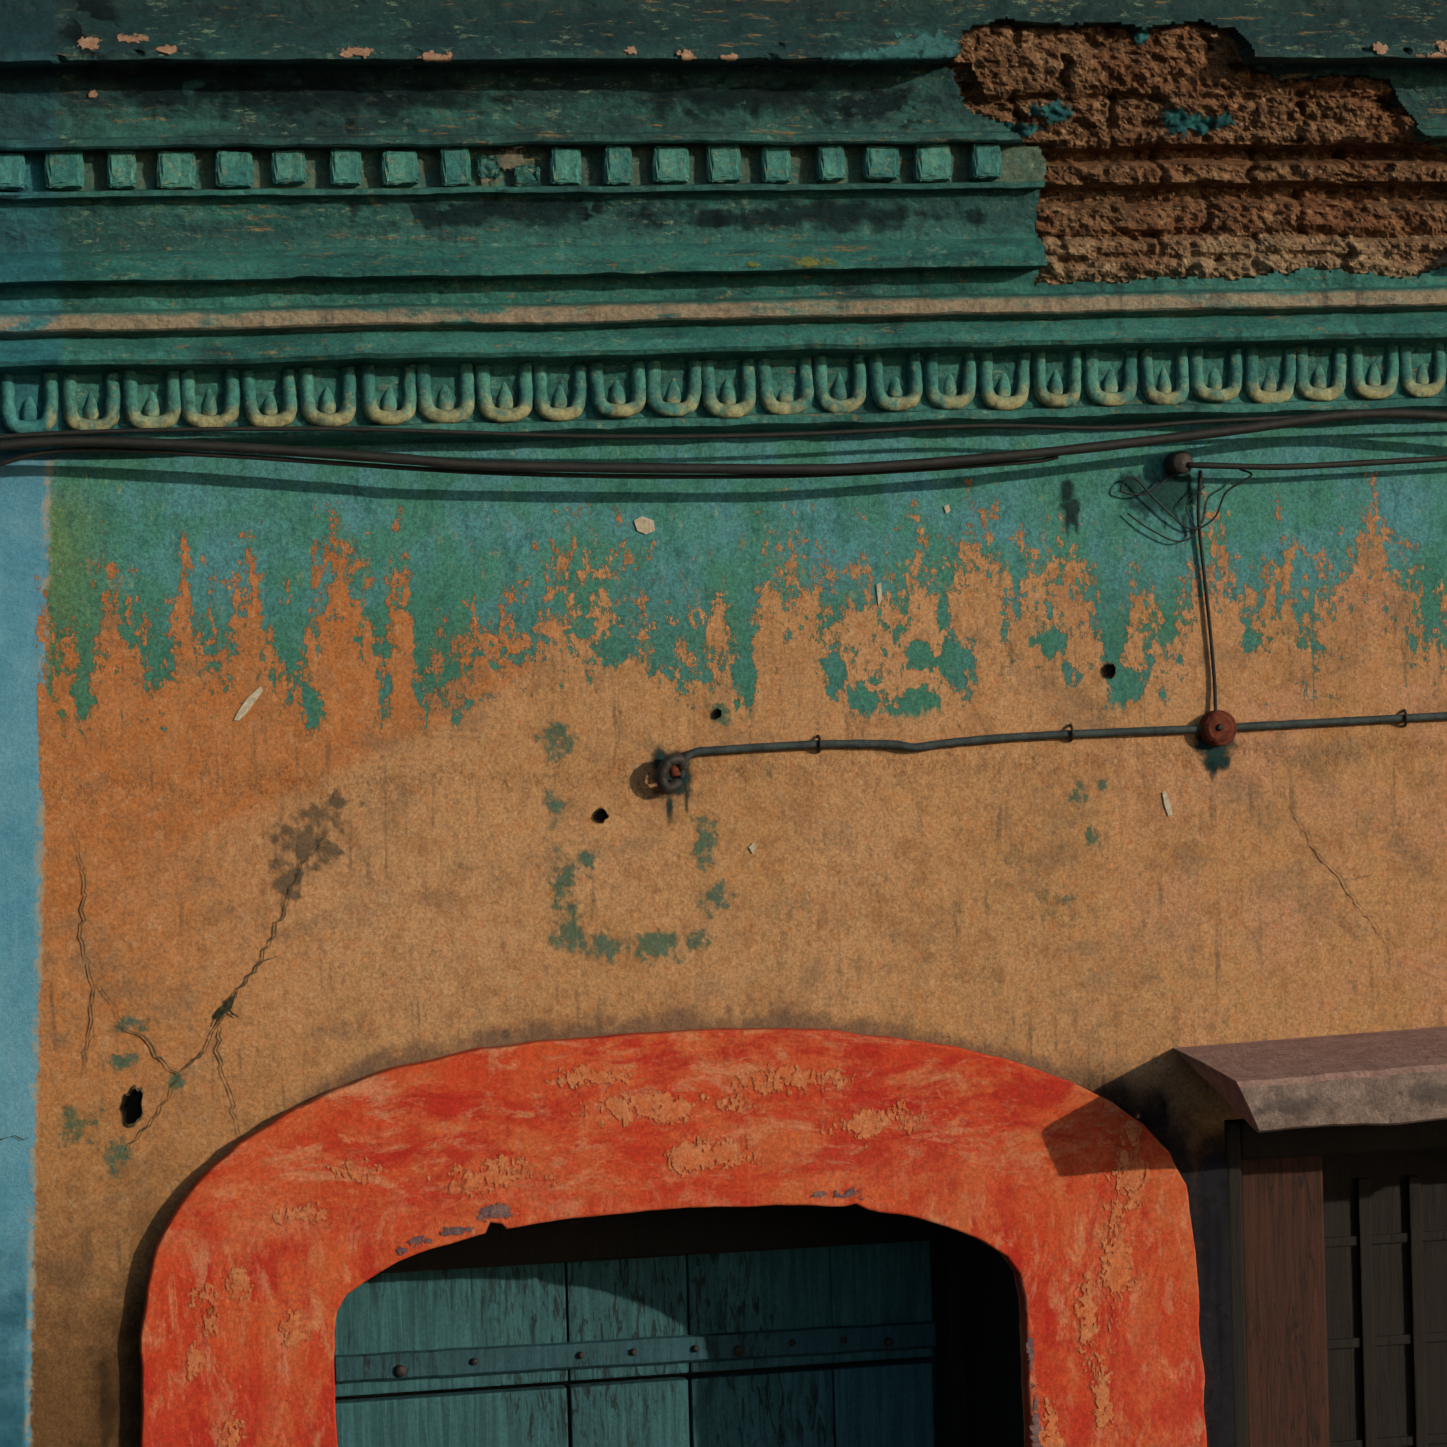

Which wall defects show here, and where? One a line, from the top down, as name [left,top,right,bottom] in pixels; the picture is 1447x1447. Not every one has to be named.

flaking render [822,21,1447,285]
crack [73,827,331,1157]
leakage [271,792,346,913]
peeling [35,471,1447,812]
peeling [1162,791,1173,816]
leakage [1091,1082,1234,1447]